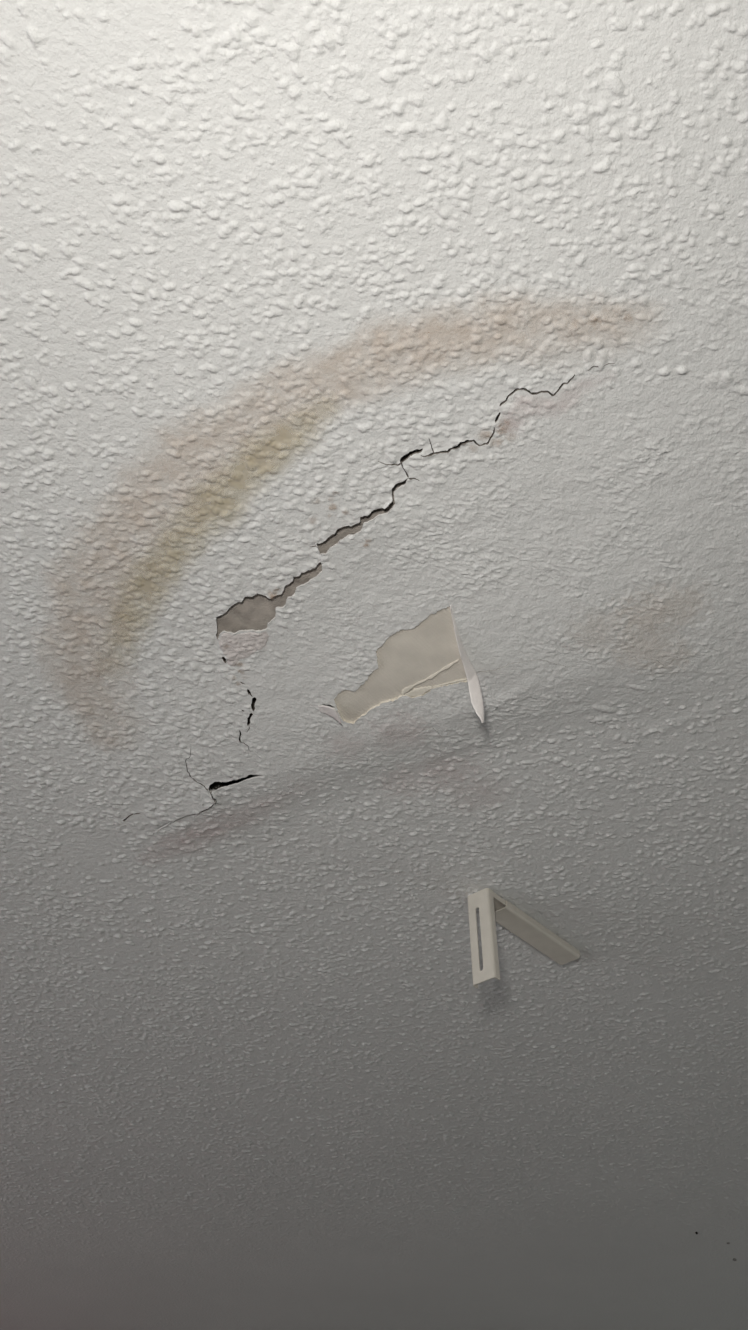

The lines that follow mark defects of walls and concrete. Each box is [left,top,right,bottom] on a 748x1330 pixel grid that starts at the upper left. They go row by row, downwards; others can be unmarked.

crack [311,363,615,555]
crack [123,657,264,836]
spalling [216,540,335,666]
peeling [318,606,484,725]